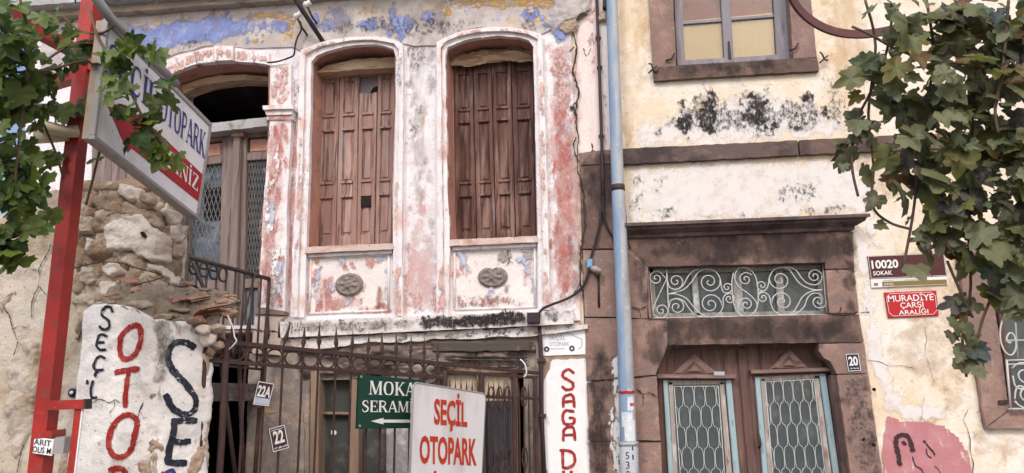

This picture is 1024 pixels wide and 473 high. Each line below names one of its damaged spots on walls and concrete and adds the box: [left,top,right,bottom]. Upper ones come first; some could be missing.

peeling [261,66,306,310]
peeling [303,0,607,322]
crack [569,32,595,299]
damp [656,78,846,137]
crack [2,244,51,356]
damp [287,319,407,331]
damp [420,285,525,338]
crack [868,327,934,419]